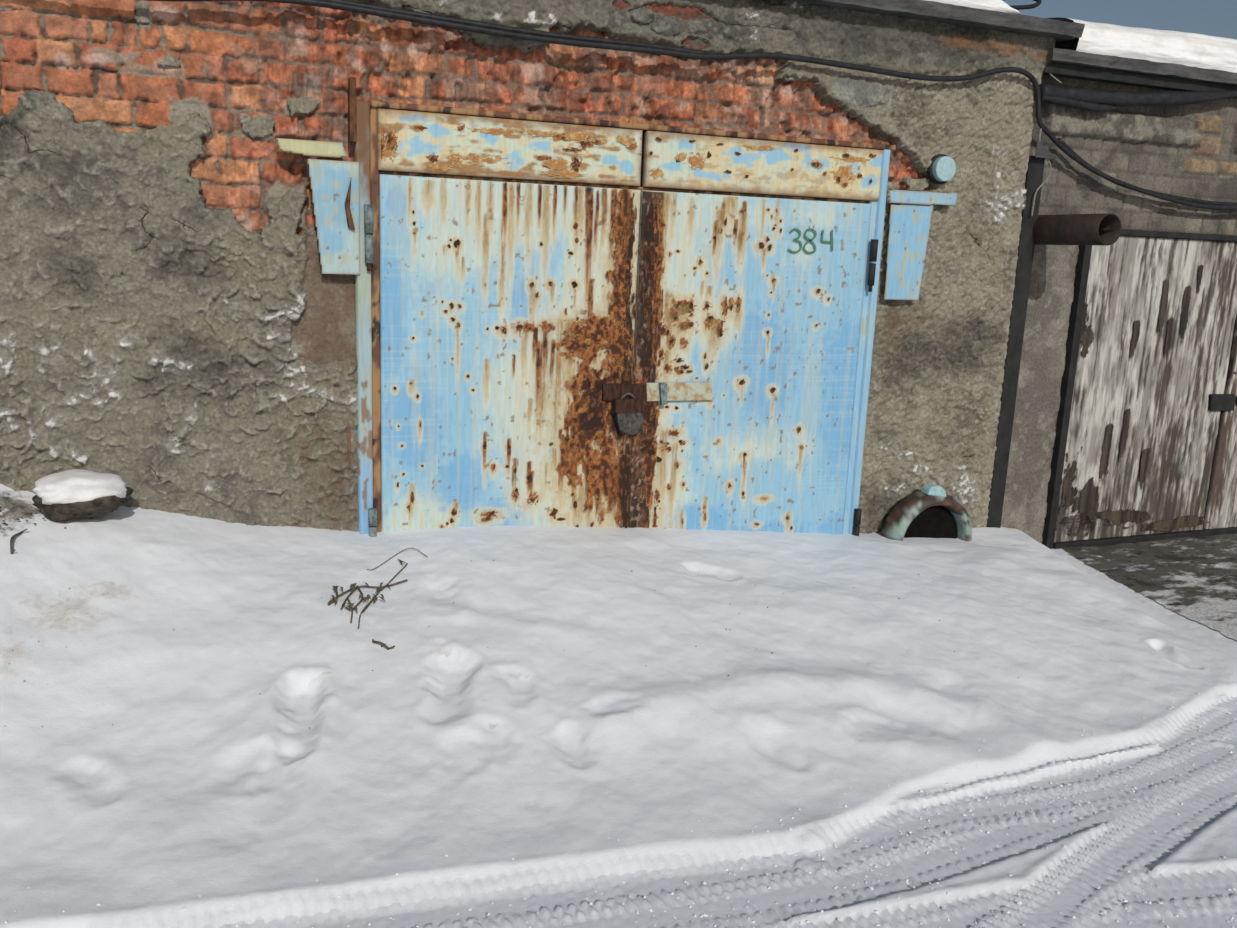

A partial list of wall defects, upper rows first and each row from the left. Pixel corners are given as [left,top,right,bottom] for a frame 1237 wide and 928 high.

corrosion [381,127,398,161]
flaking render [0,0,930,367]
corrosion [426,153,512,191]
corrosion [675,140,775,169]
corrosion [791,153,877,188]
corrosion [759,200,782,256]
corrosion [454,123,747,529]
peeling [1080,302,1094,358]
peeling [1129,320,1140,361]
peeling [1157,265,1204,359]
peeling [1055,408,1207,537]